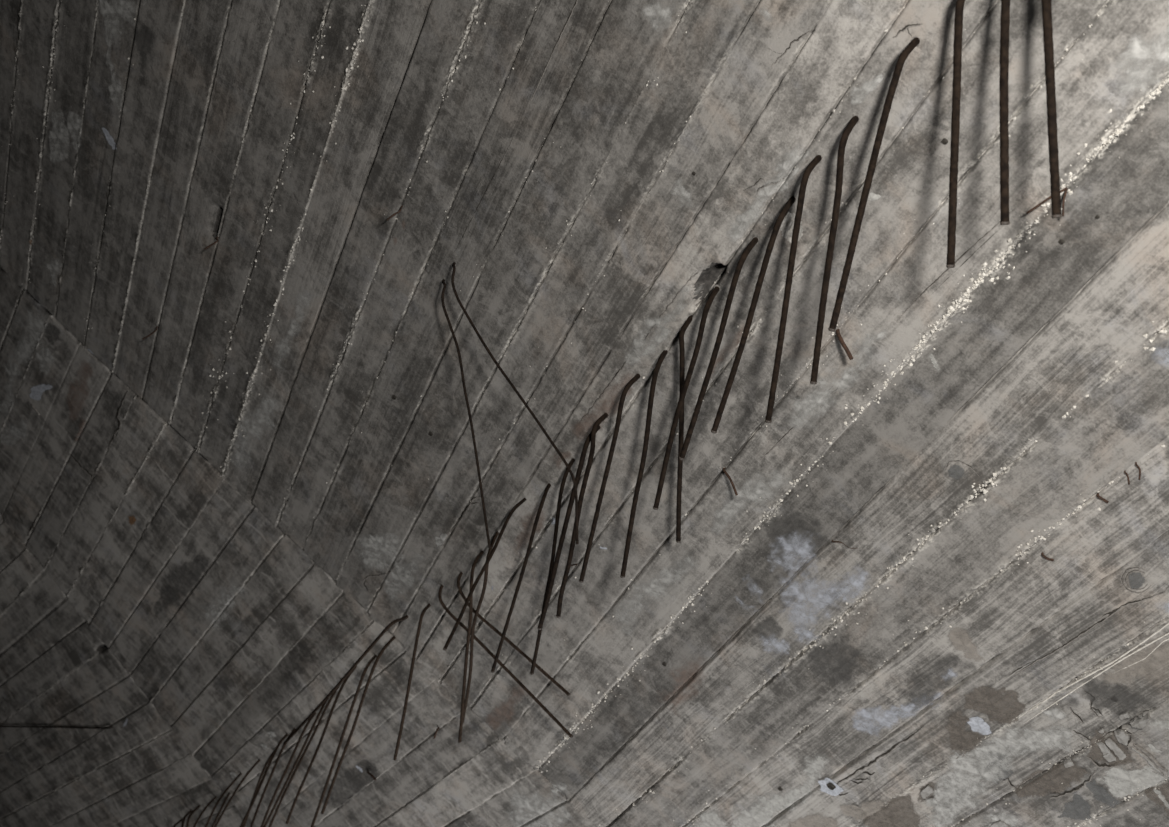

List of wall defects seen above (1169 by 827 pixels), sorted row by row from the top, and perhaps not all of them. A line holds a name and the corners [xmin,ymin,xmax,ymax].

spalling [810,36,921,384]
spalling [941,0,965,268]
spalling [999,0,1010,225]
spalling [1041,0,1062,219]
spalling [173,154,823,827]
damp [755,513,867,680]
spalling [862,782,943,827]
damp [927,687,1072,827]
spalling [1015,696,1169,815]